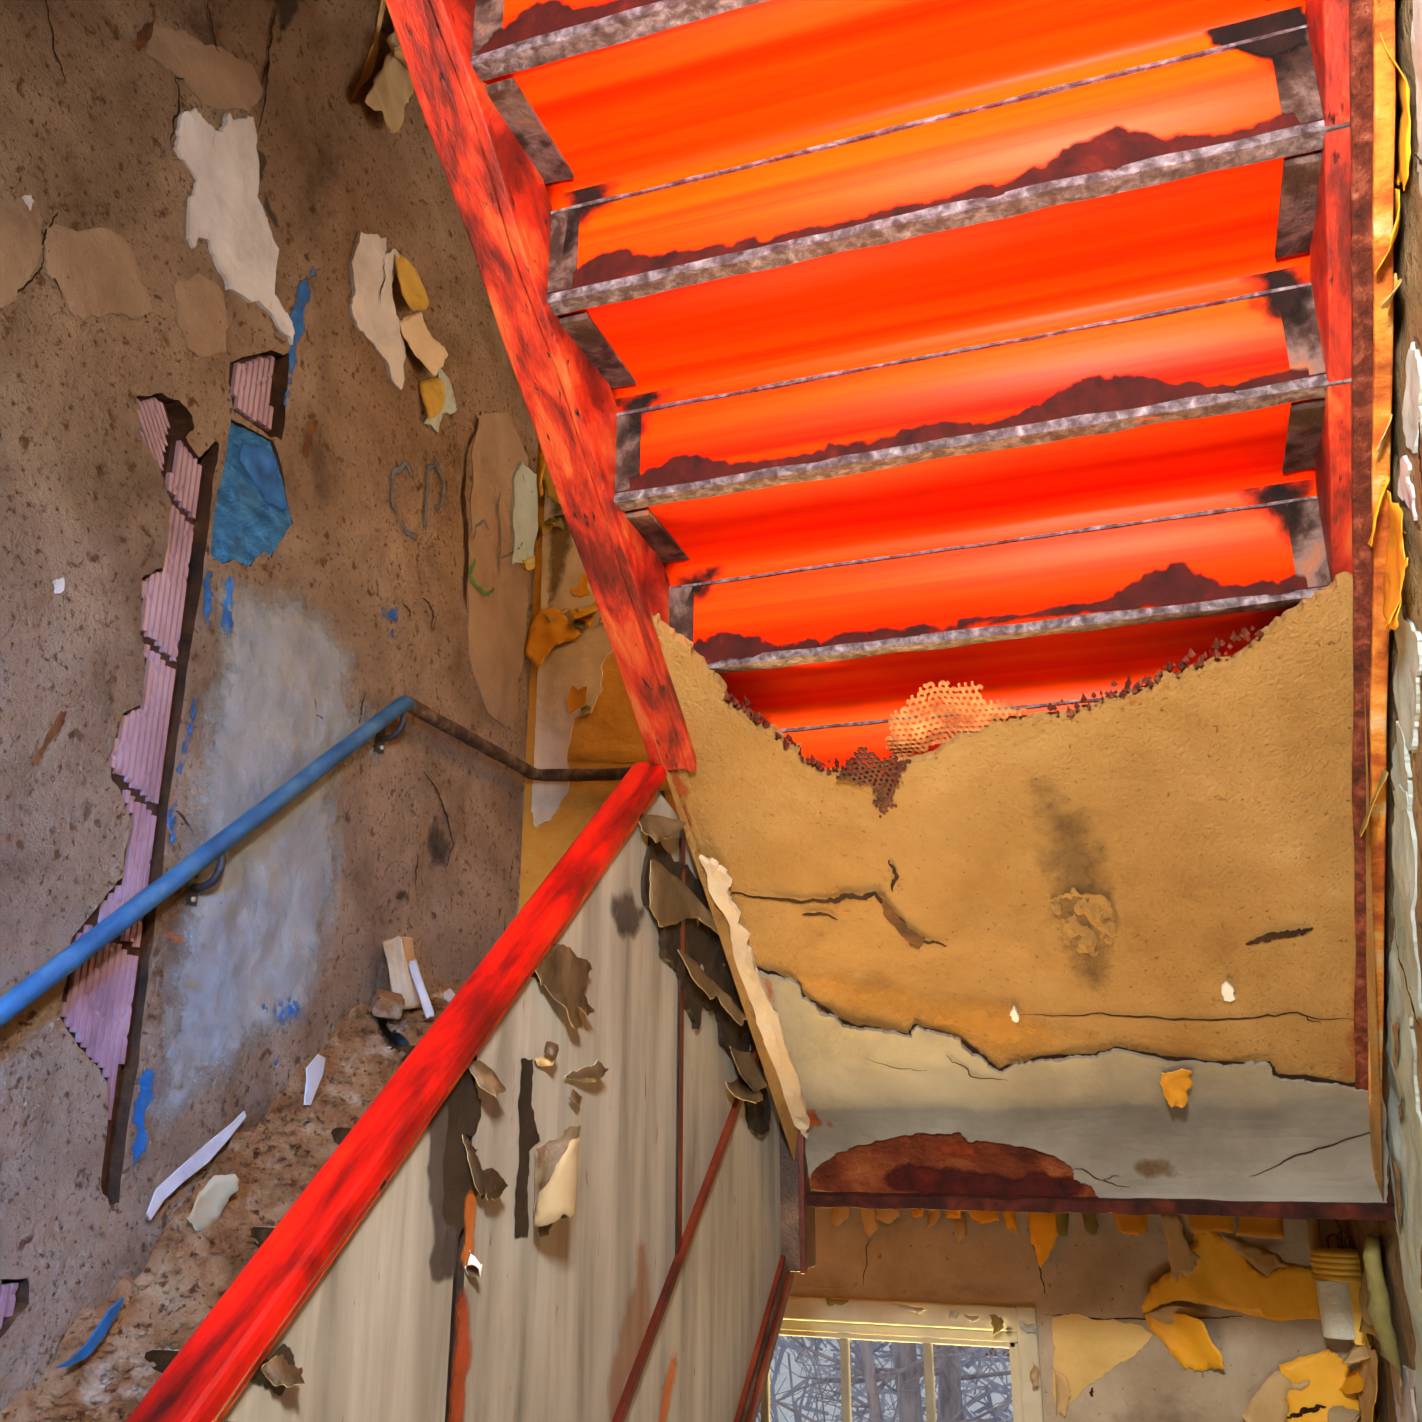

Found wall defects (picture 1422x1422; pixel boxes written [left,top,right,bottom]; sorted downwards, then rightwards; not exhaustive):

peeling [173,108,295,345]
flaking render [211,355,292,566]
flaking render [70,396,202,944]
peeling [509,441,612,827]
flaking render [60,917,144,1195]
peeling [443,1041,608,1238]
peeling [531,944,595,1029]
crack [731,860,946,947]
peeling [638,342,1422,1422]
crack [1019,1012,1353,1023]
flaking render [0,1279,19,1329]
peeling [465,1250,483,1277]